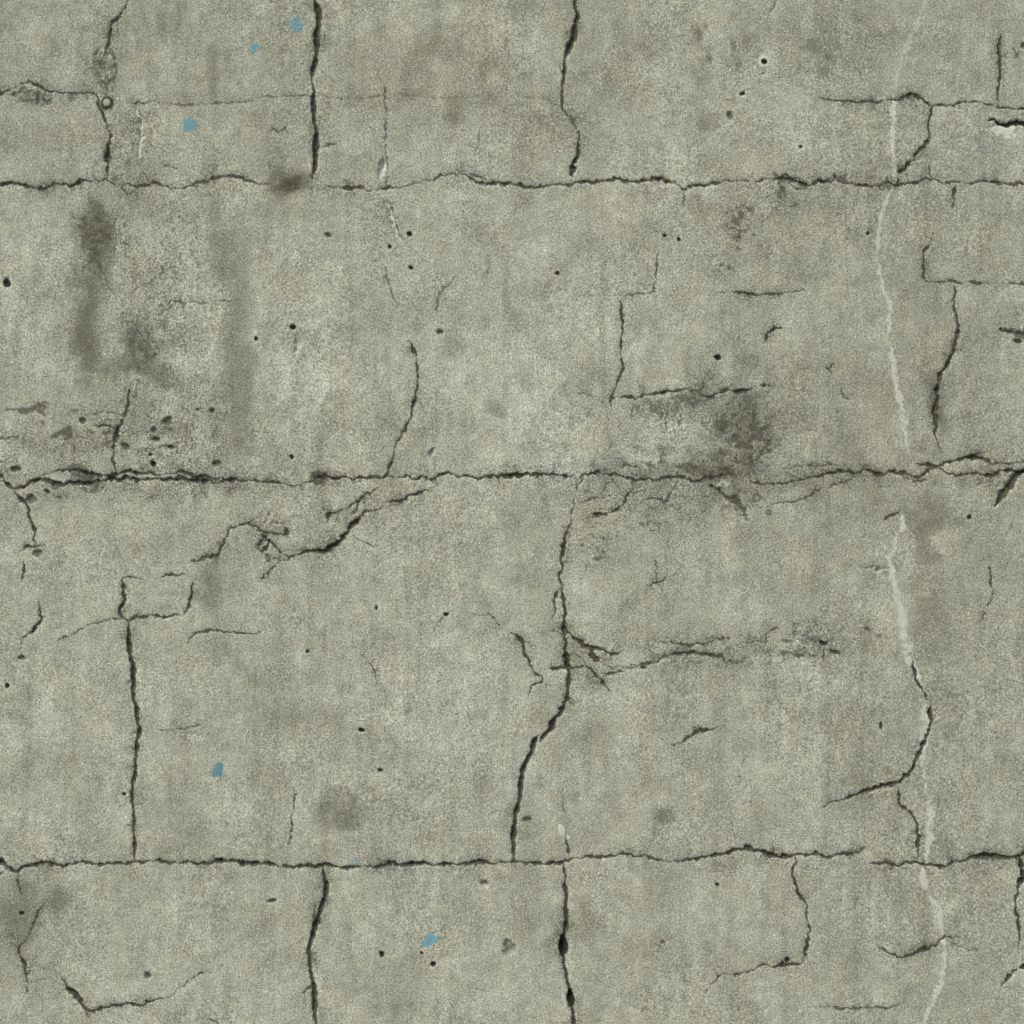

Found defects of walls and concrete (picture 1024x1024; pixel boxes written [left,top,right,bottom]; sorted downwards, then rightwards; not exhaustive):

crack [93,4,127,62]
crack [0,80,267,191]
crack [311,0,1024,208]
water stain [875,100,909,453]
crack [0,244,1024,1024]
water stain [887,515,948,1024]